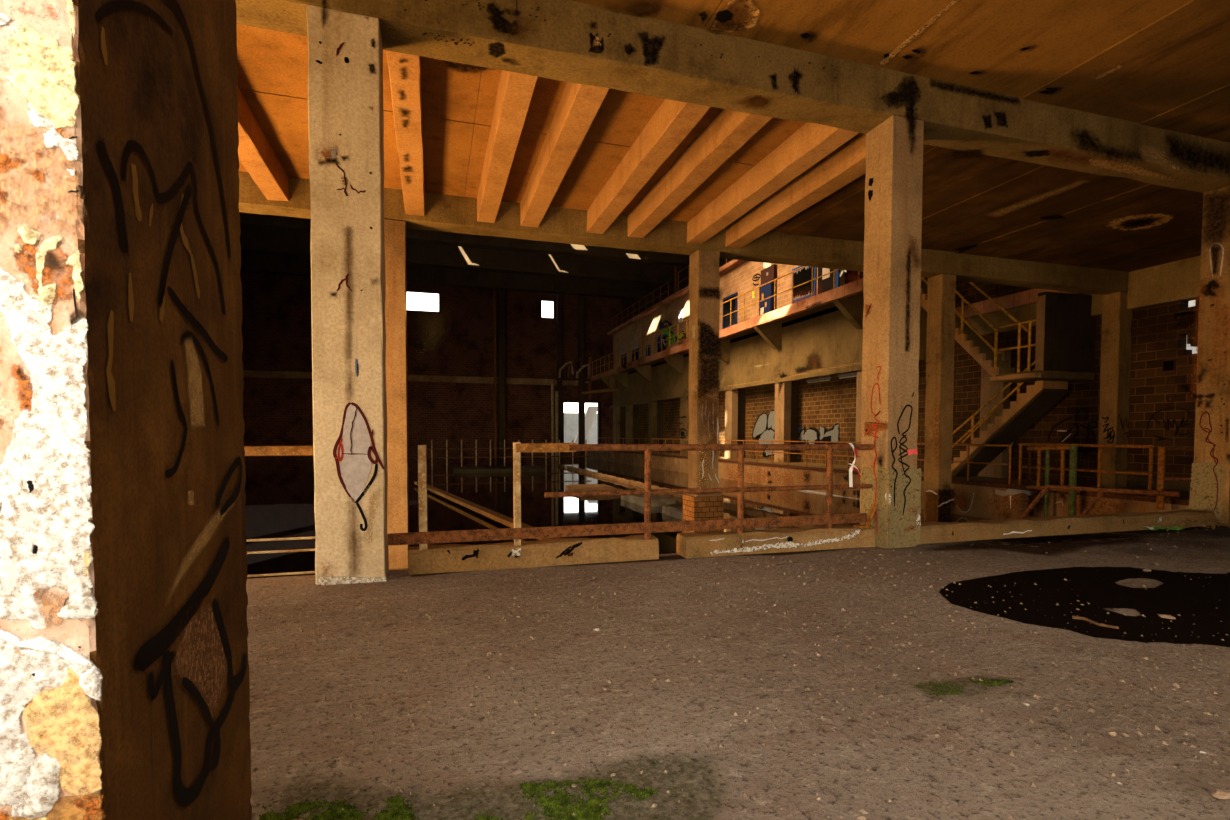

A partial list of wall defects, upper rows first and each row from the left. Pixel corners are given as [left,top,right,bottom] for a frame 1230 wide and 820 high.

peeling [6,0,79,193]
flaking render [0,268,102,820]